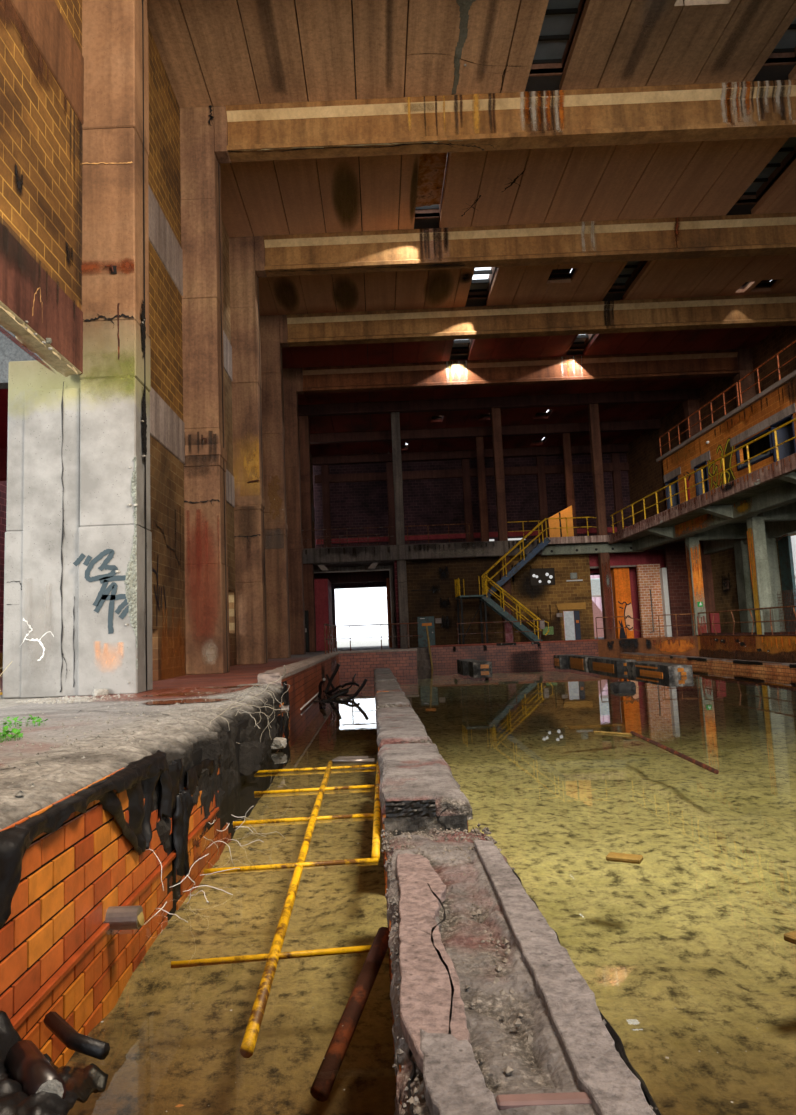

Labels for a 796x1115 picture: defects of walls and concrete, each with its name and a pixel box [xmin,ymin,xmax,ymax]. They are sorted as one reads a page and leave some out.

leakage [0,216,59,301]
rust [82,260,134,273]
leakage [334,169,358,226]
leakage [410,164,459,303]
crack [83,314,134,326]
rust [609,454,796,654]
spalling [0,683,290,856]